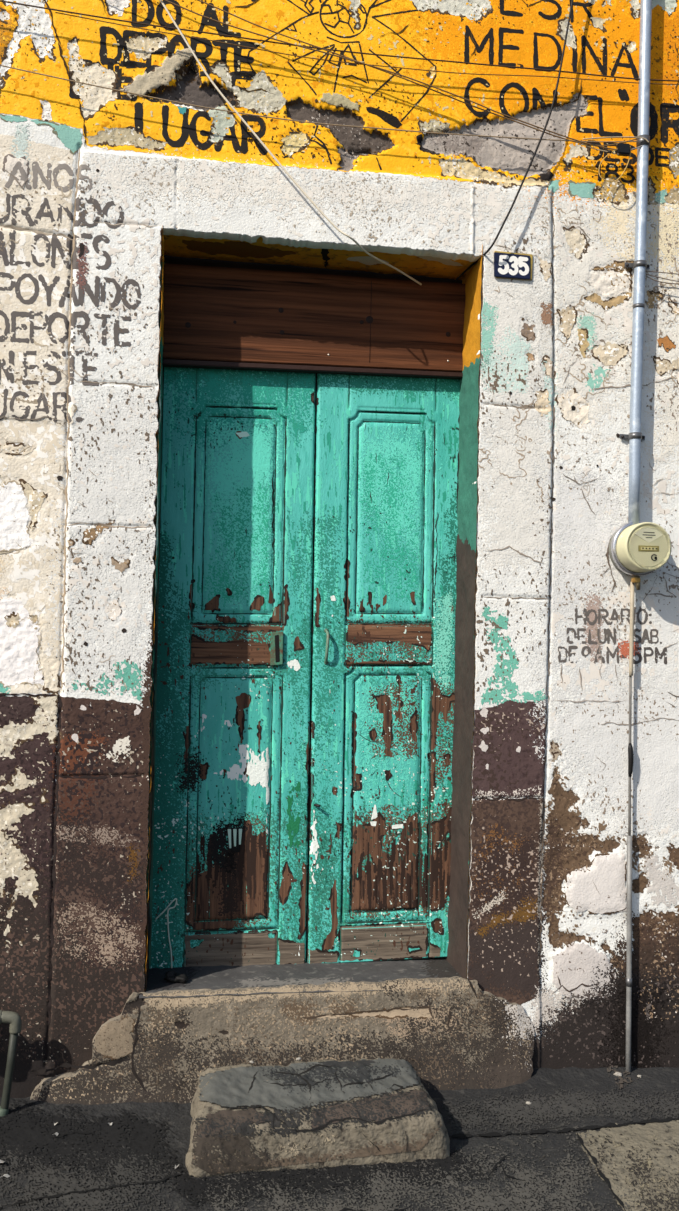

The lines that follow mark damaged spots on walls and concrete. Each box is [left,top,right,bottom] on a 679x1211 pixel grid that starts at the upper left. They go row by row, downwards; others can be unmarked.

peeling [409,0,493,24]
peeling [556,17,577,51]
peeling [584,0,612,32]
peeling [629,0,677,19]
peeling [0,597,78,966]
peeling [189,579,304,667]
peeling [233,693,263,753]
peeling [182,721,452,967]
peeling [332,560,455,803]
crack [433,413,460,607]
crack [475,196,679,993]
spalling [516,741,679,974]